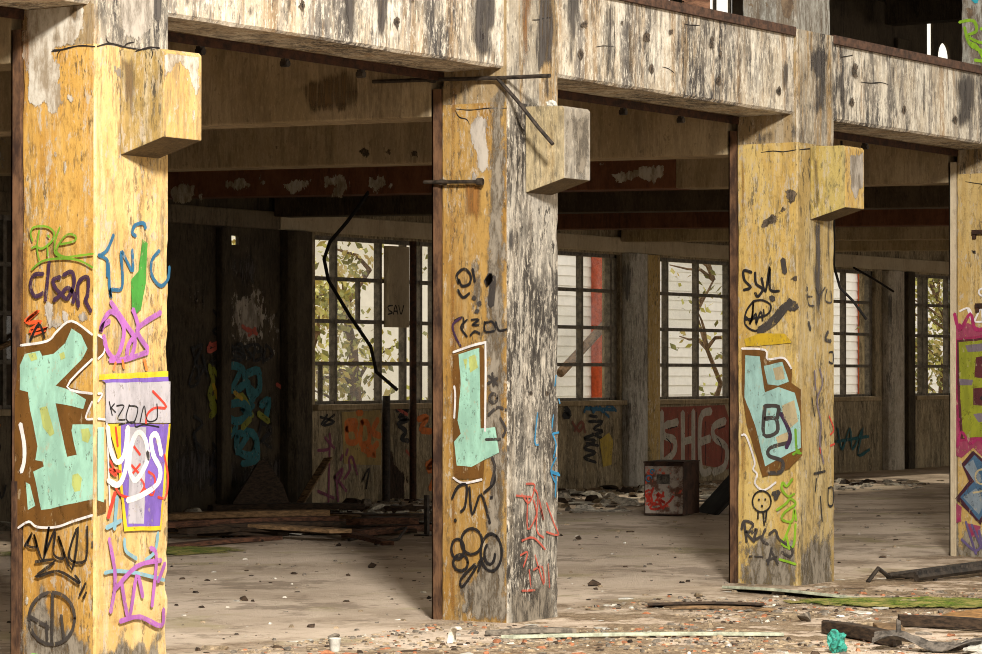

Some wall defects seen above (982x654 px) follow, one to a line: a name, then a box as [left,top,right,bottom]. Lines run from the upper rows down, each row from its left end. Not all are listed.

water stain [333,0,356,31]
water stain [377,0,388,34]
water stain [474,0,495,54]
water stain [568,0,579,61]
peeling [22,5,84,113]
peeling [165,53,200,95]
water stain [959,75,982,126]
peeling [470,116,491,180]
water stain [459,87,555,623]